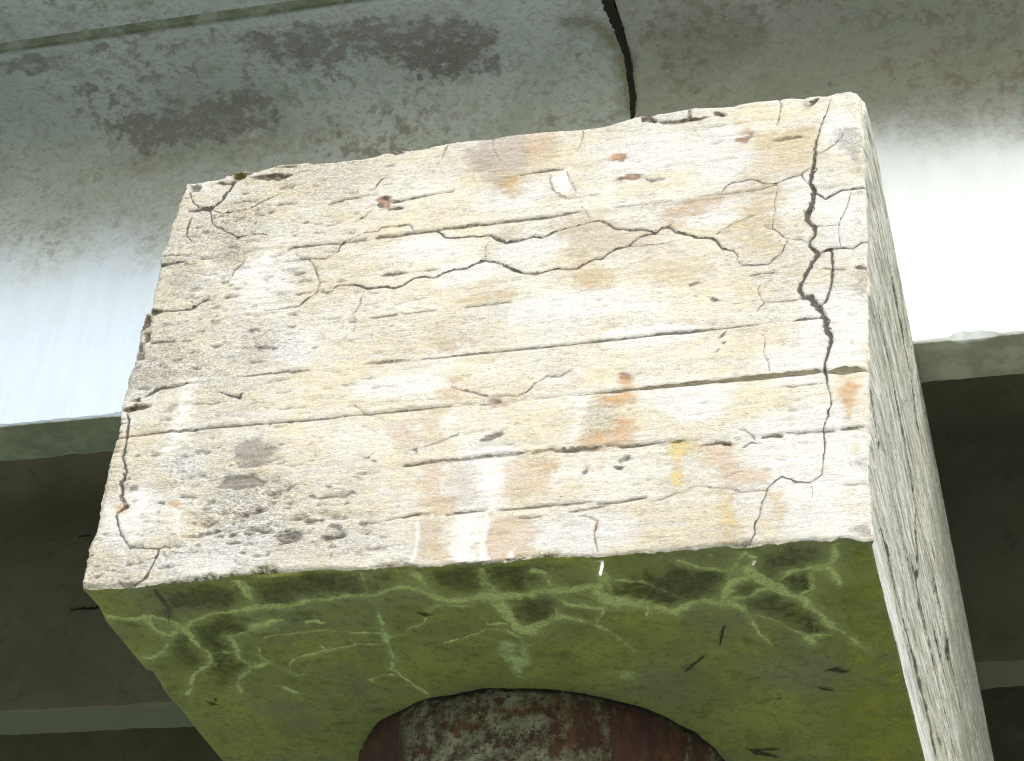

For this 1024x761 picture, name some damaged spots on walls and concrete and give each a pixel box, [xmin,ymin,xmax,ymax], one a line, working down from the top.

crack [602,0,637,115]
corrosion [376,195,391,208]
crack [115,100,961,756]
corrosion [603,373,633,402]
water stain [442,458,507,563]
water stain [499,641,529,673]